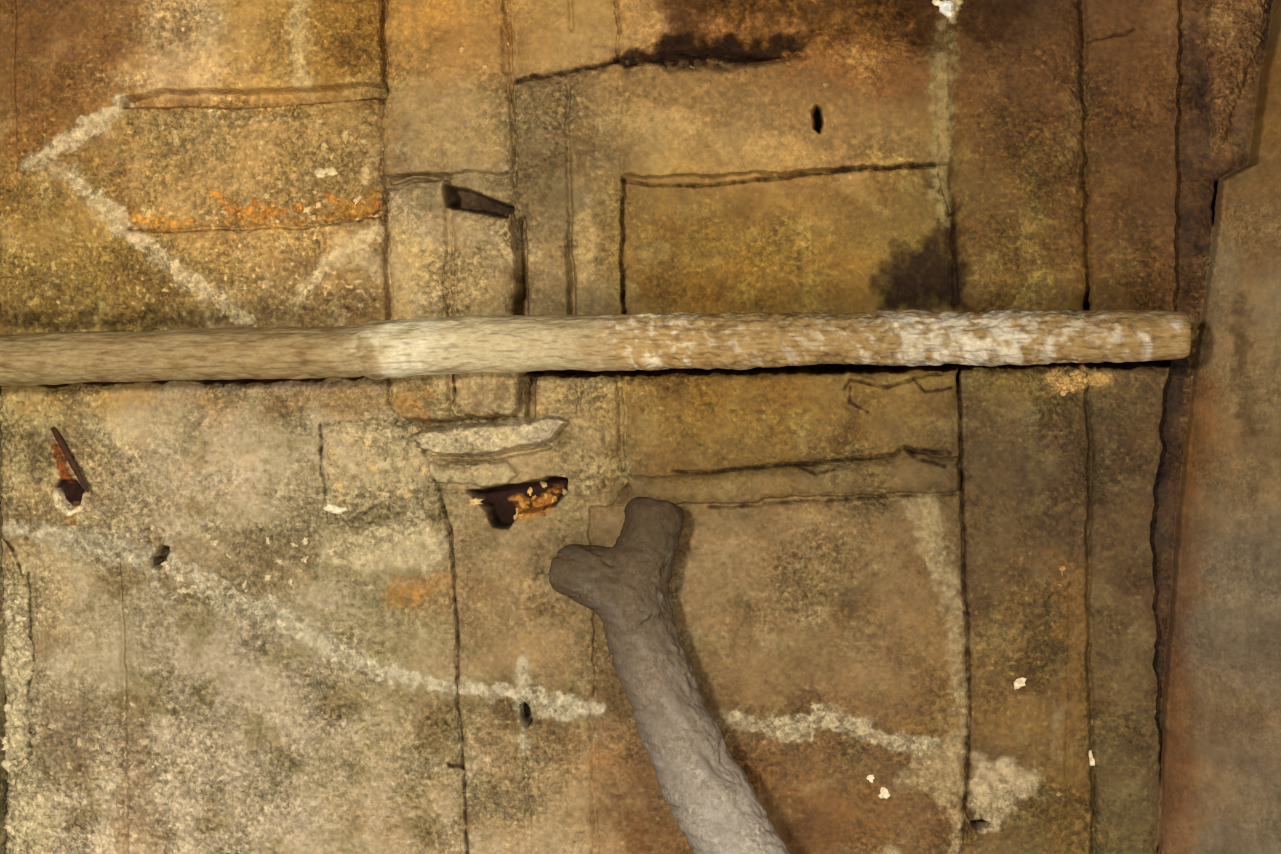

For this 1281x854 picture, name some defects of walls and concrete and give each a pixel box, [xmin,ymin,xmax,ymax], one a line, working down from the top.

water stain [614,33,800,69]
water stain [928,0,962,226]
rust [121,212,194,232]
rust [205,185,380,227]
rust [51,444,75,482]
peeling [513,481,568,521]